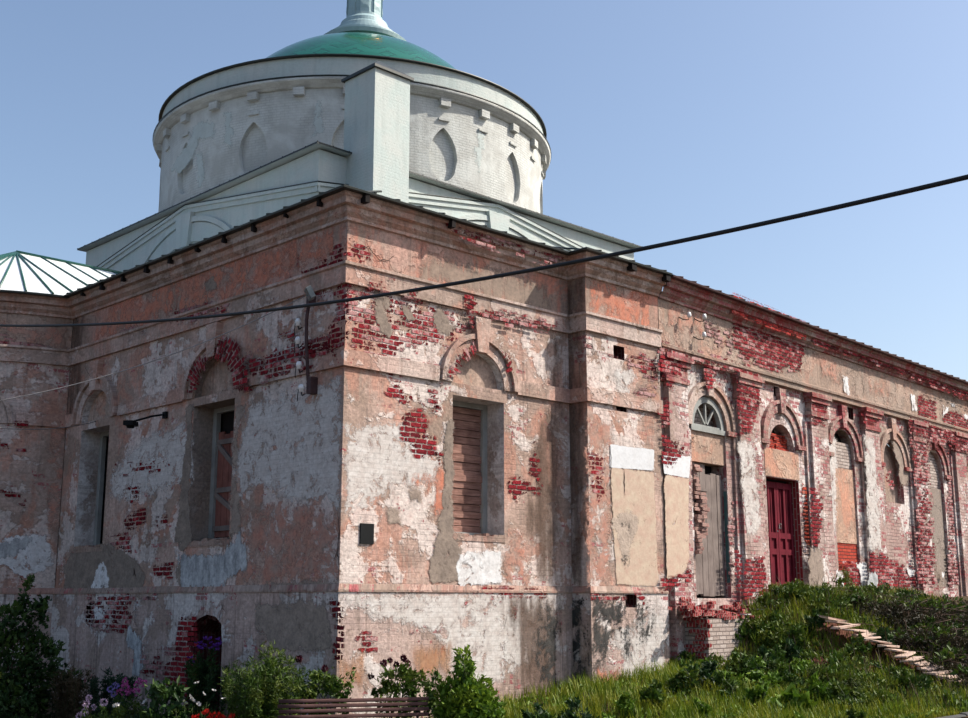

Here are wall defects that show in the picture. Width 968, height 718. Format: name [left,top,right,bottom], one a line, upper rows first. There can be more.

flaking render [285,238,371,277]
flaking render [187,274,559,393]
peeling [0,534,55,578]
peeling [237,373,444,511]
peeling [387,507,401,524]
flaking render [508,441,543,502]
peeling [585,293,968,679]
flaking render [84,562,199,698]
peeling [329,549,547,685]
damp [510,594,655,692]